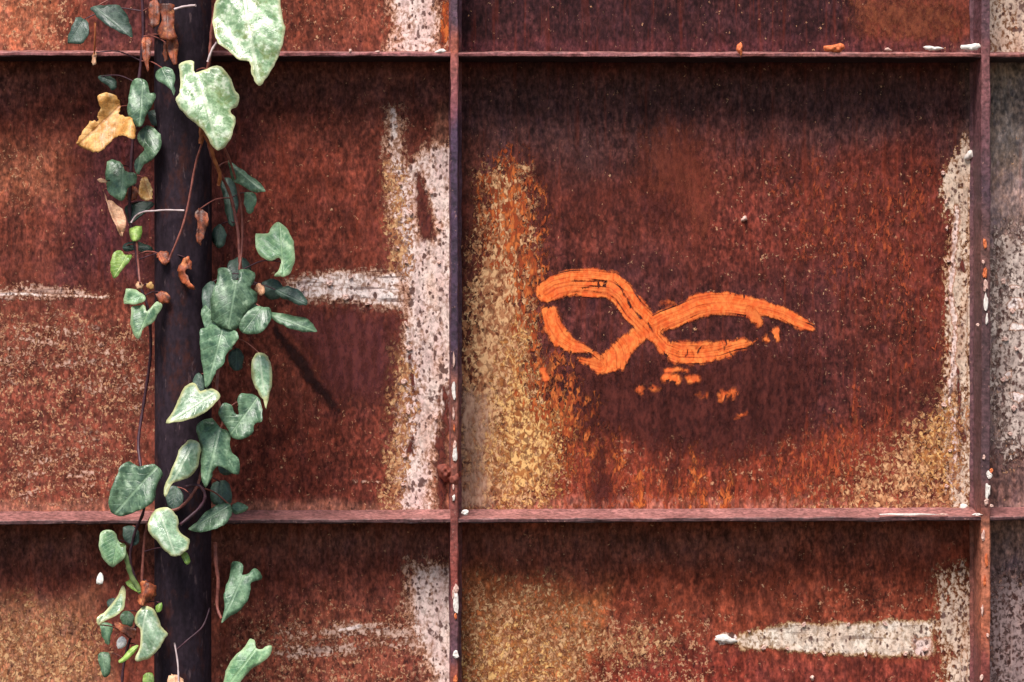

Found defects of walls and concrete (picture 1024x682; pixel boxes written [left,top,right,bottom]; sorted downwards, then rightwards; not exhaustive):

peeling [375,0,449,53]
corrosion [823,43,845,53]
corrosion [856,0,960,39]
peeling [285,104,457,510]
corrosion [434,145,734,510]
corrosion [766,165,944,372]
peeling [880,132,1024,516]
corrosion [745,384,970,508]
corrosion [0,594,111,682]
peeling [268,555,459,682]
corrosion [461,572,678,682]
peeling [715,554,1024,682]